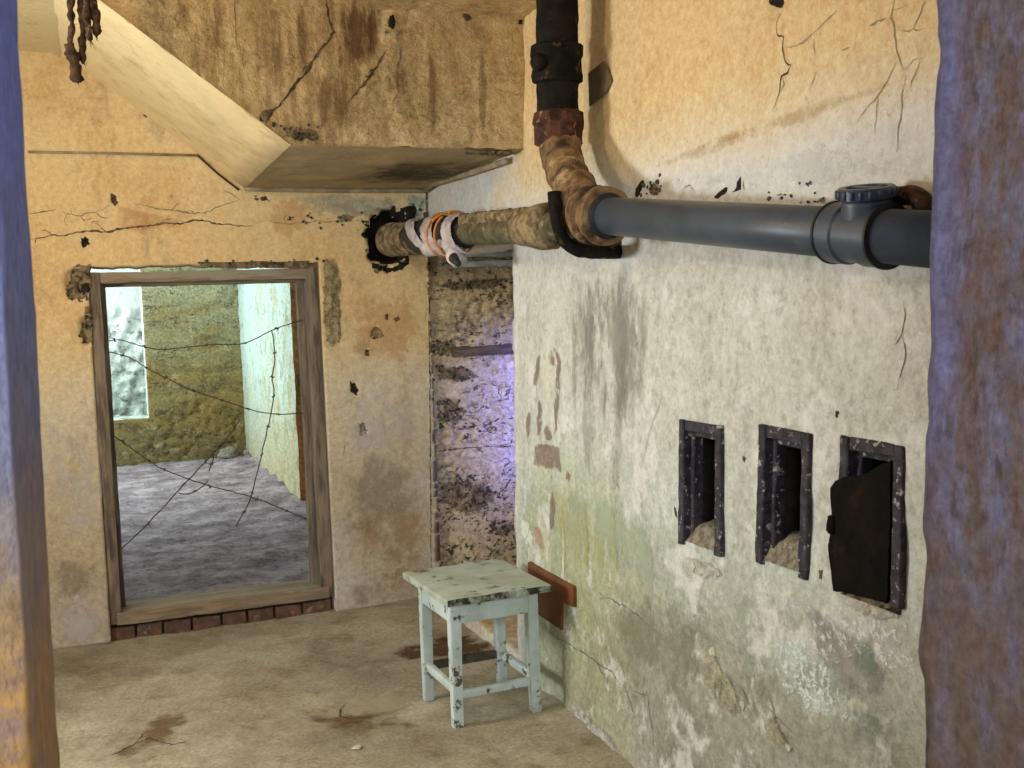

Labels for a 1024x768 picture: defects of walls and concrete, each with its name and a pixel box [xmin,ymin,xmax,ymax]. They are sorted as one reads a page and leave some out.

crack [272,1,337,112]
crack [774,12,835,108]
crack [856,2,925,152]
crack [31,190,359,243]
spalling [361,203,429,274]
spalling [65,263,94,345]
crack [895,300,906,390]
crack [551,633,654,745]